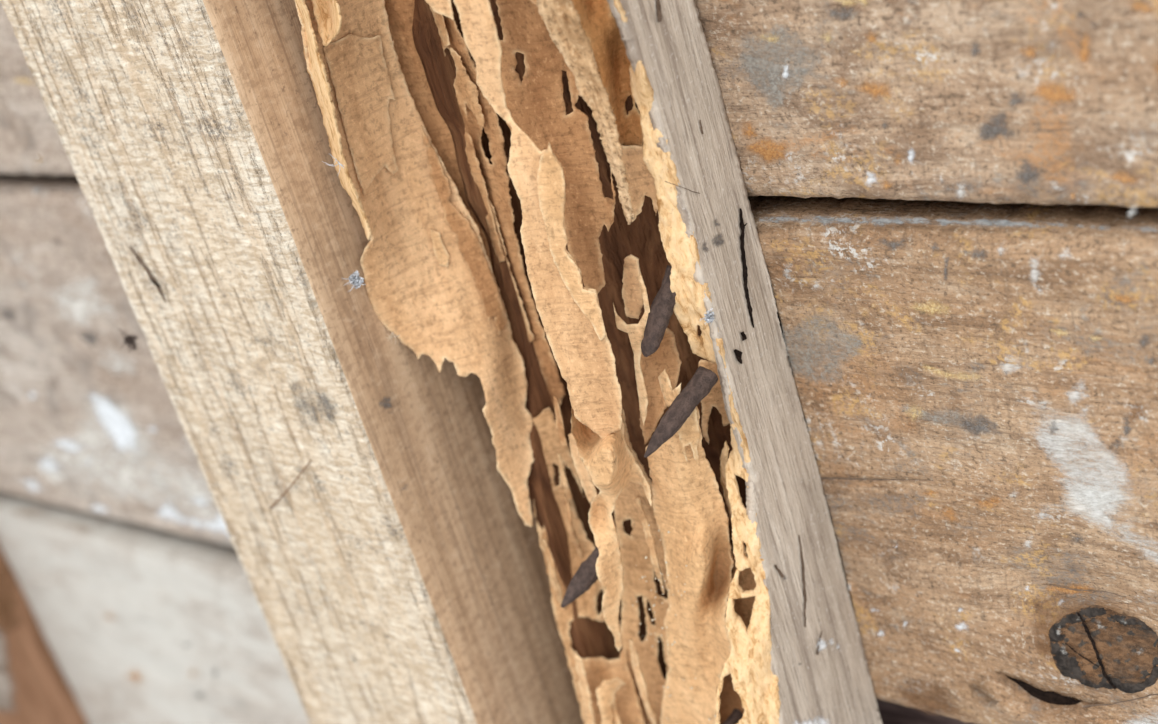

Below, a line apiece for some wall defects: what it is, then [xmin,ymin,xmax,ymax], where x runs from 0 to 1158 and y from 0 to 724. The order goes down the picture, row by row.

peeling [323,34,399,197]
peeling [420,5,534,343]
peeling [537,145,606,340]
peeling [553,396,598,503]
peeling [677,408,700,466]
peeling [720,441,732,519]
crack [1006,584,1158,708]